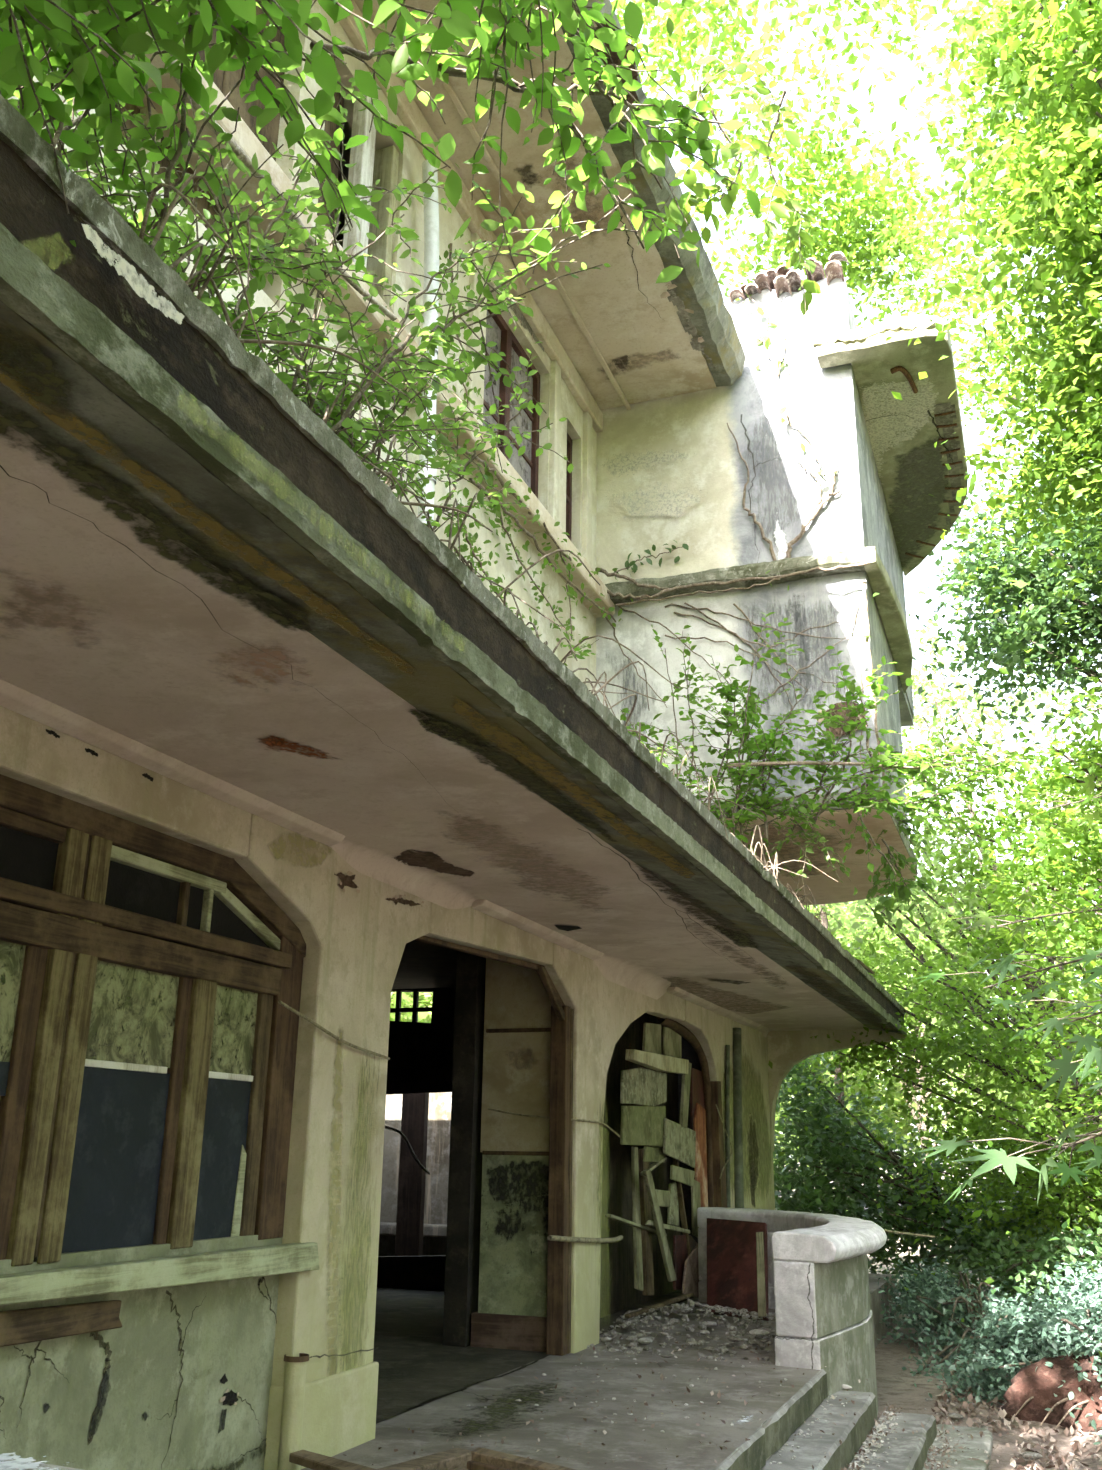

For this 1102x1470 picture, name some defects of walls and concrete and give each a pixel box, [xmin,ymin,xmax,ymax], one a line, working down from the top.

water stain [747,414,800,560]
water stain [889,437,950,567]
crack [0,465,480,828]
water stain [746,594,843,710]
corrosion [260,736,338,759]
peeling [334,871,361,893]
peeling [394,850,475,879]
water stain [328,1030,342,1375]
crack [0,1331,112,1445]
crack [154,1290,205,1468]
spalling [218,1374,239,1433]